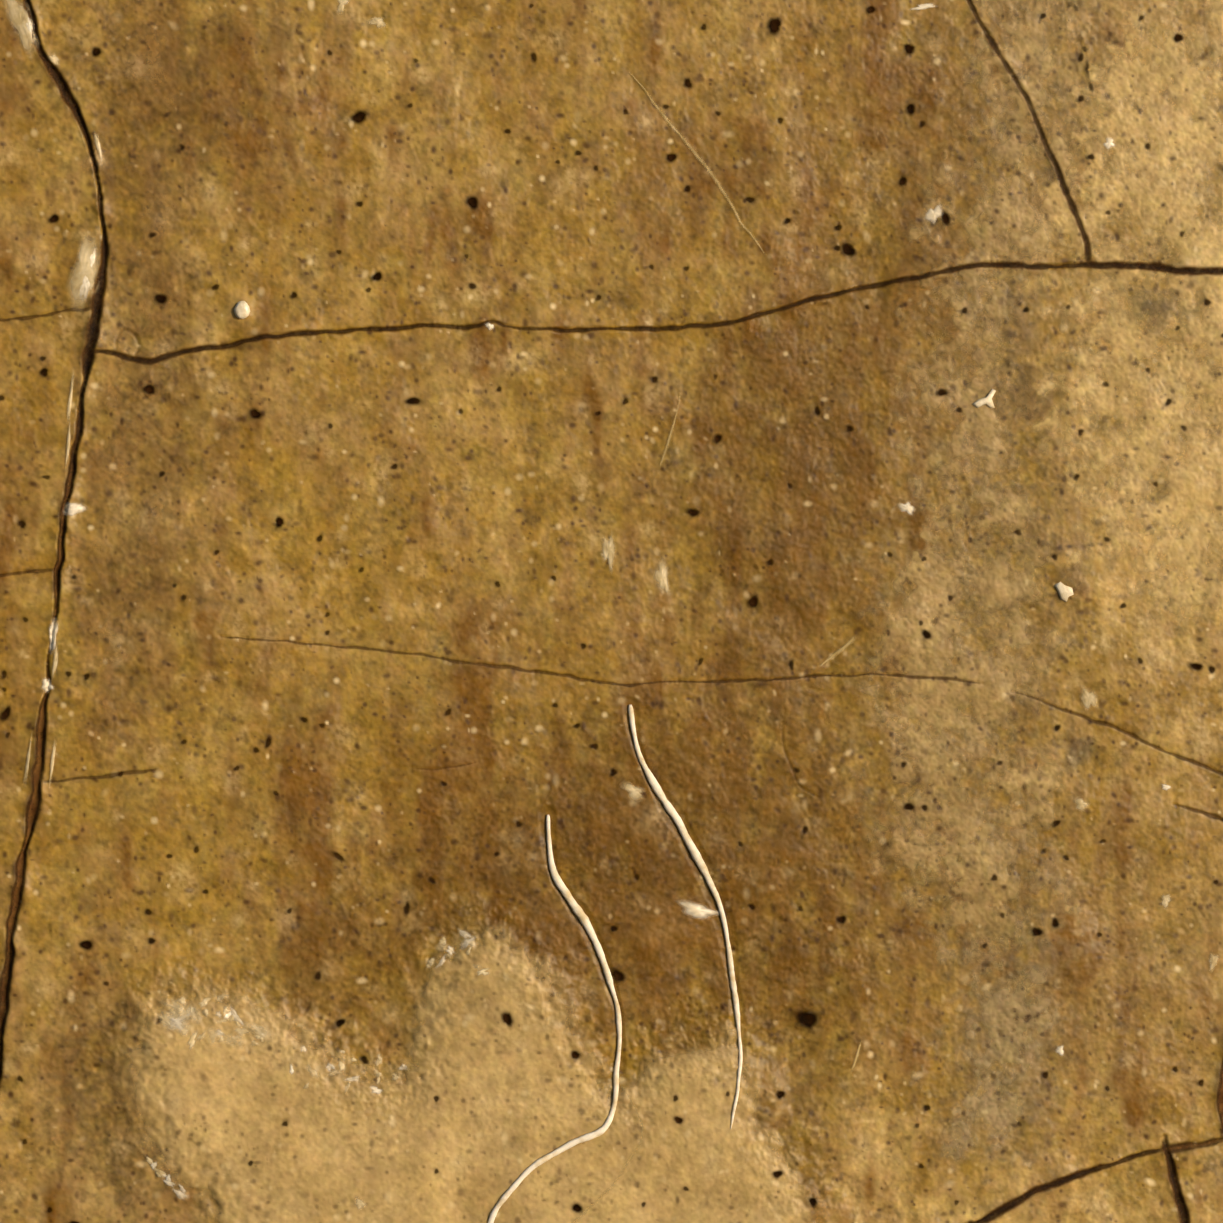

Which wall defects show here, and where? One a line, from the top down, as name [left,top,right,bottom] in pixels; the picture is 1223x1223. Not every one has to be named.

crack [967,0,1091,257]
crack [95,261,1223,365]
crack [0,0,107,1081]
crack [238,637,975,686]
crack [88,771,145,779]
crack [1020,693,1223,775]
crack [1180,805,1223,821]
crack [970,1062,1223,1223]